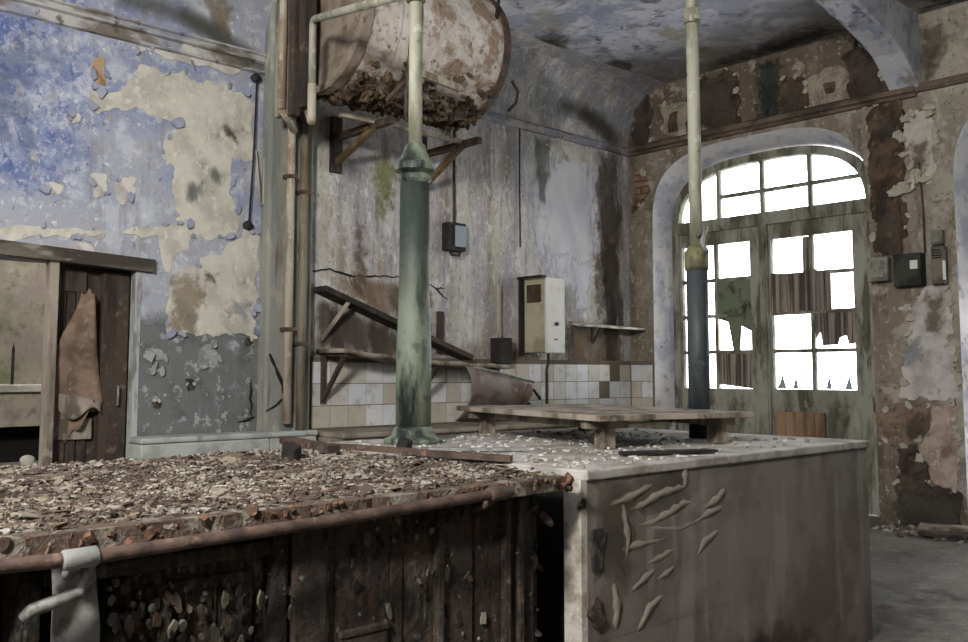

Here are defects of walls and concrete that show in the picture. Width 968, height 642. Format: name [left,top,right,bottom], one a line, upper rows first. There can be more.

peeling [639,0,686,28]
corrosion [316,61,409,122]
corrosion [422,72,500,133]
spalling [631,94,667,146]
spalling [700,67,742,130]
spalling [777,75,815,113]
peeling [38,182,64,195]
peeling [86,44,261,377]
peeling [0,222,107,252]
crack [313,268,399,292]